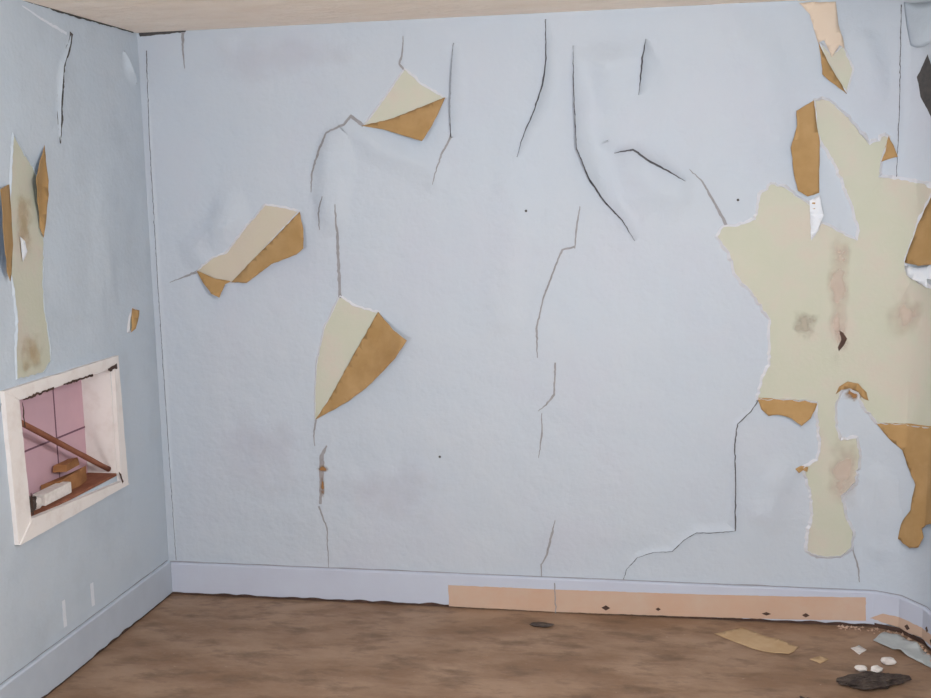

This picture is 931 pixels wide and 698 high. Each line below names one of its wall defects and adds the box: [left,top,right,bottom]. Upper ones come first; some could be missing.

peeling [0,133,51,380]
crack [22,1,186,69]
peeling [171,204,304,298]
peeling [310,38,447,190]
crack [432,136,452,185]
crack [689,169,728,225]
peeling [818,42,854,94]
peeling [313,204,407,446]
crack [535,206,580,458]
peeling [715,96,931,559]
crack [318,445,329,568]
crack [540,521,557,613]